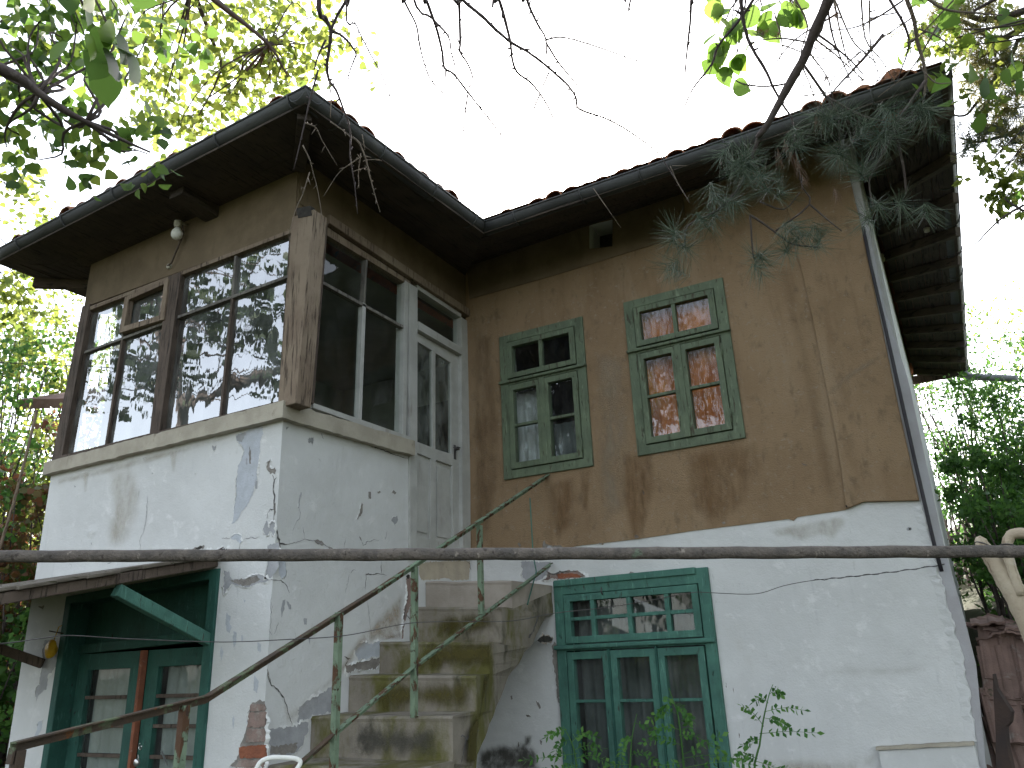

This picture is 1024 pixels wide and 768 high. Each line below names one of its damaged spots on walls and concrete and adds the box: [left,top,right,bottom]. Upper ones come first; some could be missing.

peeling [185,426,276,550]
spalling [221,520,287,603]
crack [222,475,387,637]
spalling [520,560,589,583]
crack [267,669,291,721]
flaking render [229,675,332,768]
peeling [344,638,381,677]